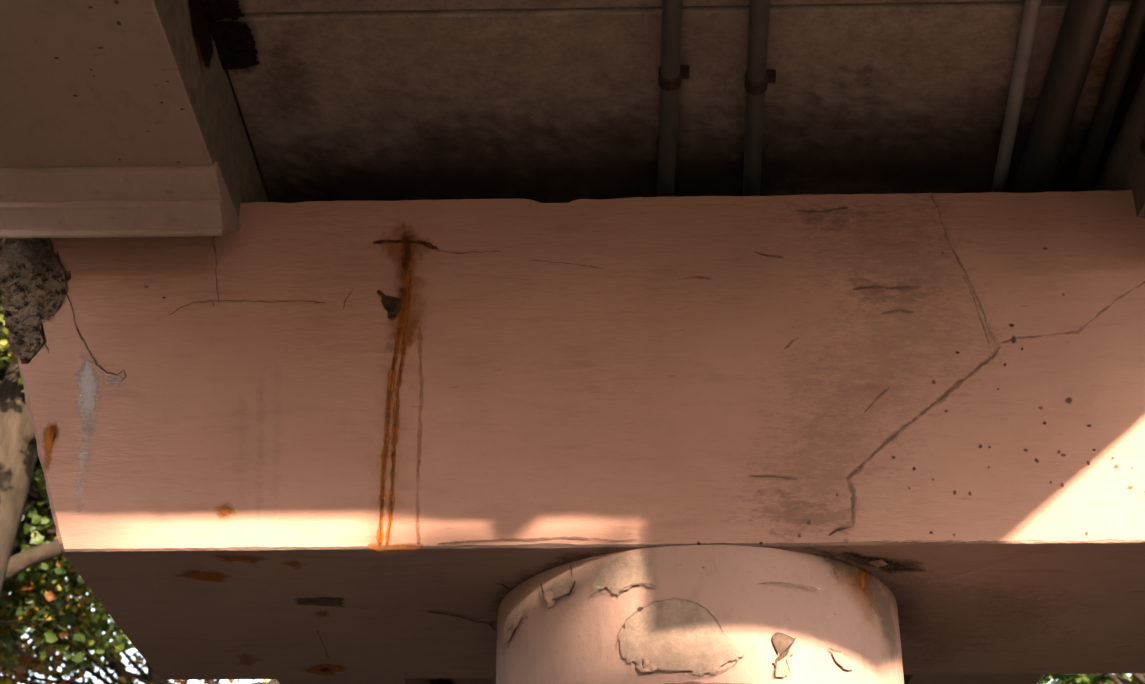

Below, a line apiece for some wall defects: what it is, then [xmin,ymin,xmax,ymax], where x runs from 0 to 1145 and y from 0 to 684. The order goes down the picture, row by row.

spalling [0,238,69,360]
crack [64,289,126,382]
crack [168,236,353,316]
rust [43,424,58,469]
leakage [77,358,98,431]
rust [368,226,438,549]
crack [829,332,1028,536]
crack [881,537,1145,545]
peeling [772,632,796,678]